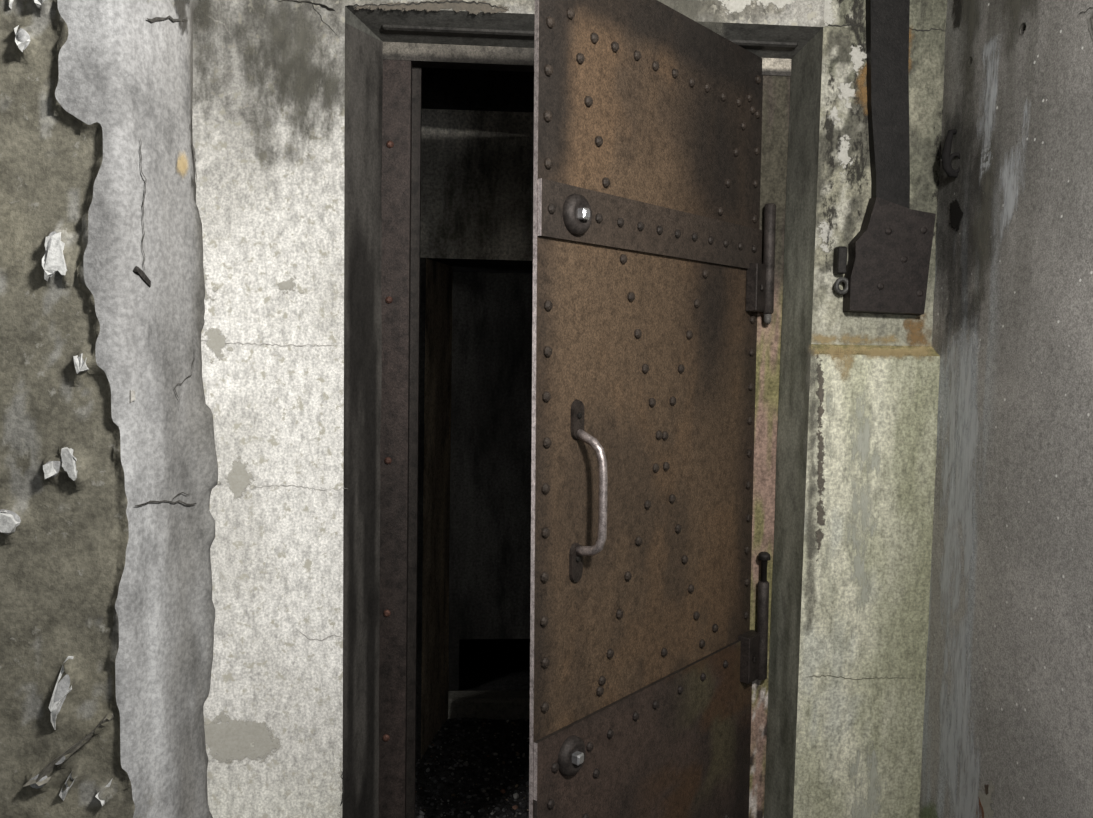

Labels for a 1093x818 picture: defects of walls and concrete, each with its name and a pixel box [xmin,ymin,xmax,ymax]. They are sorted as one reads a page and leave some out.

peeling [175,0,190,33]
water stain [193,0,214,86]
water stain [253,3,341,127]
water stain [658,0,718,26]
peeling [718,0,795,15]
spalling [823,0,836,29]
spalling [825,45,867,175]
water stain [821,67,841,271]
spalling [132,266,151,288]
spalling [817,220,835,252]
peeling [0,0,135,818]
water stain [847,392,881,612]